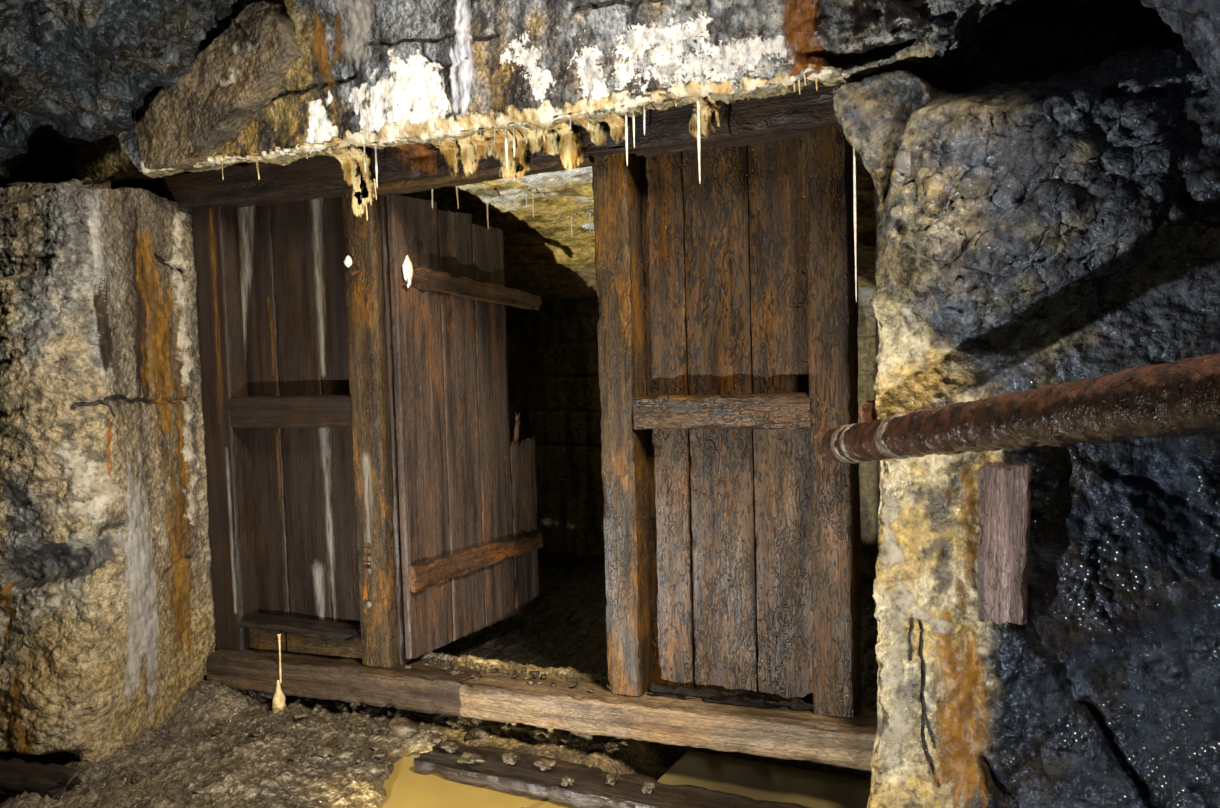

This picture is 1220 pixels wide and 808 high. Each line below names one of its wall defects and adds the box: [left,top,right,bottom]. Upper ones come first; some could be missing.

damp [306,91,338,148]
damp [337,0,373,67]
damp [349,0,472,143]
damp [499,29,556,103]
damp [567,11,795,115]
corrosion [781,0,826,83]
crack [70,395,187,417]
corrosion [136,231,192,660]
damp [119,455,158,700]
corrosion [934,469,988,808]
crack [907,617,941,787]